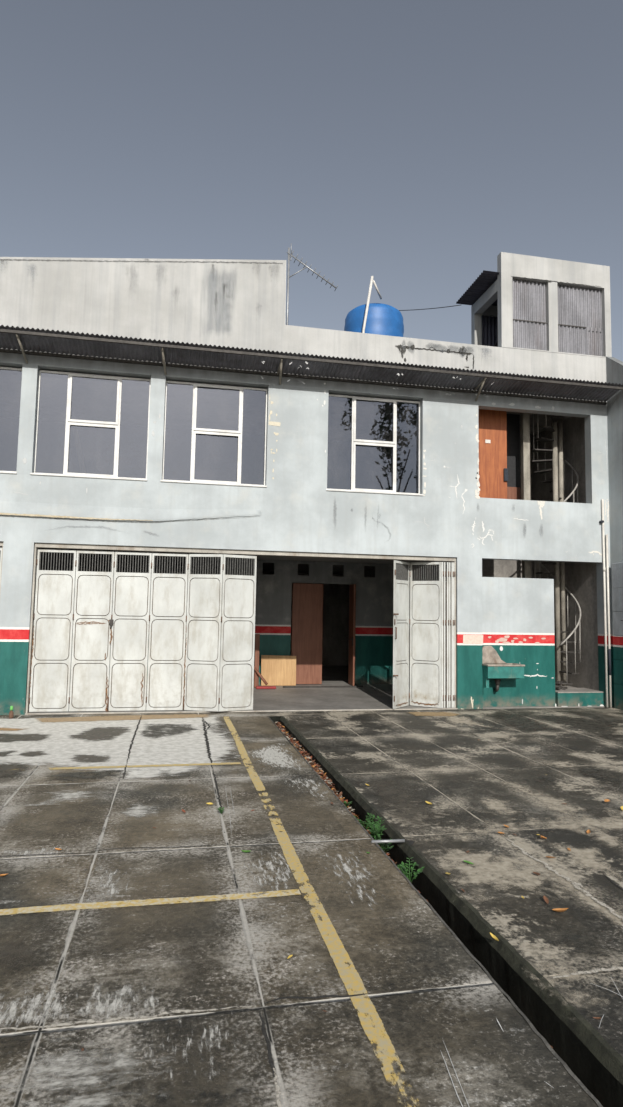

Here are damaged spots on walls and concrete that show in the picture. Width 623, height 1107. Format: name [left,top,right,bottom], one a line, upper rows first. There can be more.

crack [430,425,494,548]
peeling [463,635,546,651]